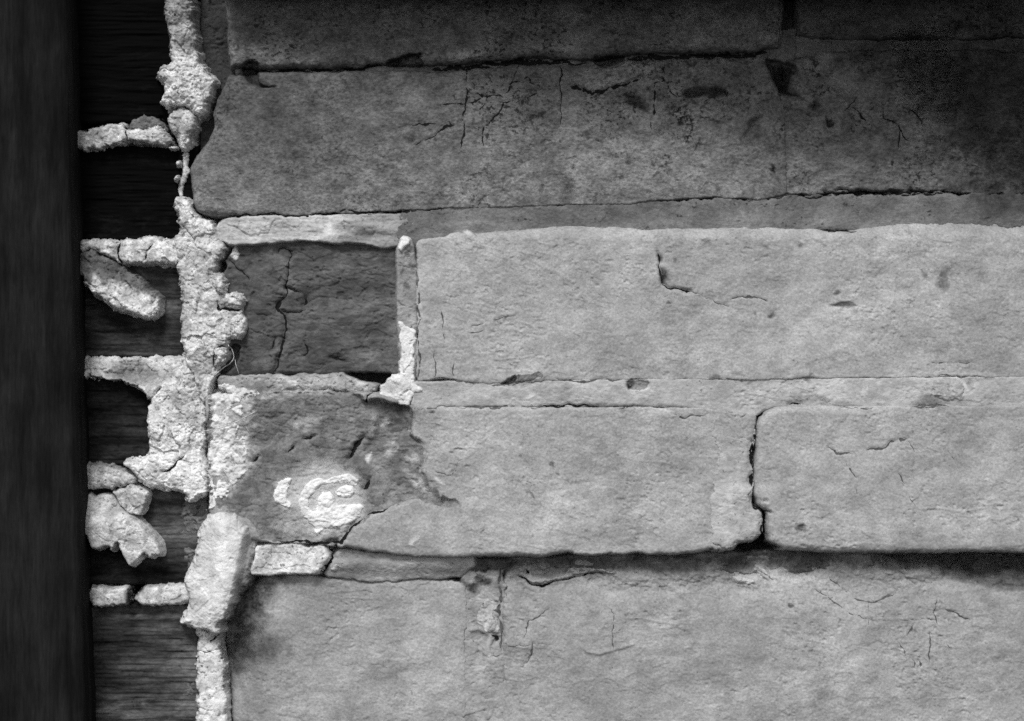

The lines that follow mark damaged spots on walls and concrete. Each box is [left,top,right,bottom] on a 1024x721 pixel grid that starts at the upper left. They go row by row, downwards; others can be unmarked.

crack [260,64,382,73]
crack [412,50,768,147]
crack [272,247,344,372]
crack [657,252,766,306]
crack [491,566,603,663]